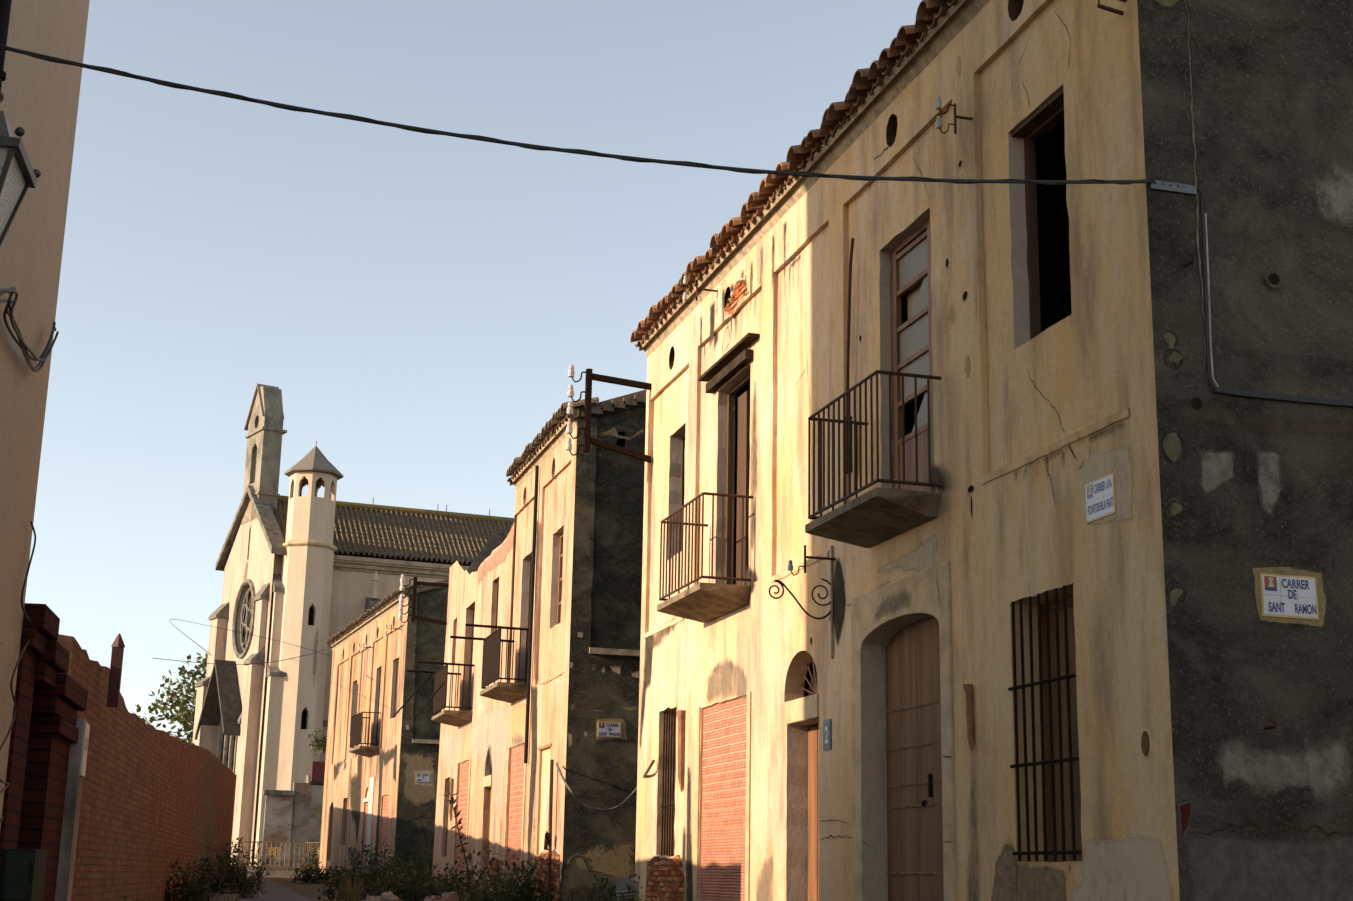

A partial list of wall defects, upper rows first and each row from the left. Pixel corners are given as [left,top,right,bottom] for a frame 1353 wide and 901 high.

water stain [590,618,675,747]
peeling [1219,742,1349,796]
peeling [533,843,686,901]
water stain [968,790,1173,901]
water stain [1188,834,1353,901]